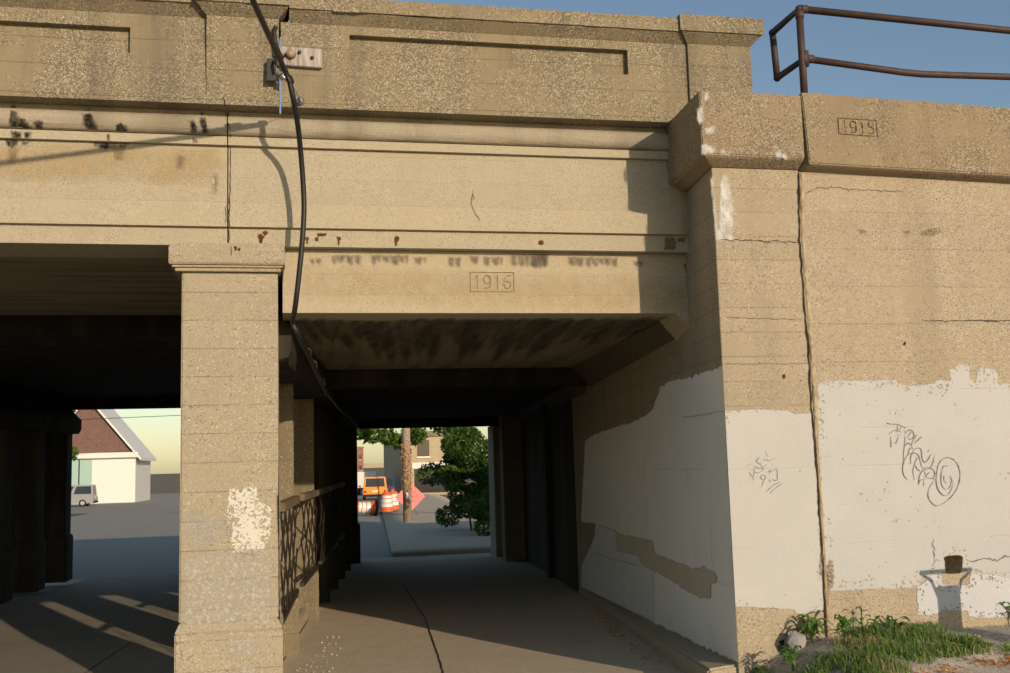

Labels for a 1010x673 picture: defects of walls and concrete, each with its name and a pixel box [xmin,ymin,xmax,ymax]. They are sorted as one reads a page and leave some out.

damp [6,105,44,146]
damp [84,110,129,158]
damp [191,113,208,134]
crack [720,173,902,637]
peeling [184,485,280,625]
peeling [581,363,1010,662]